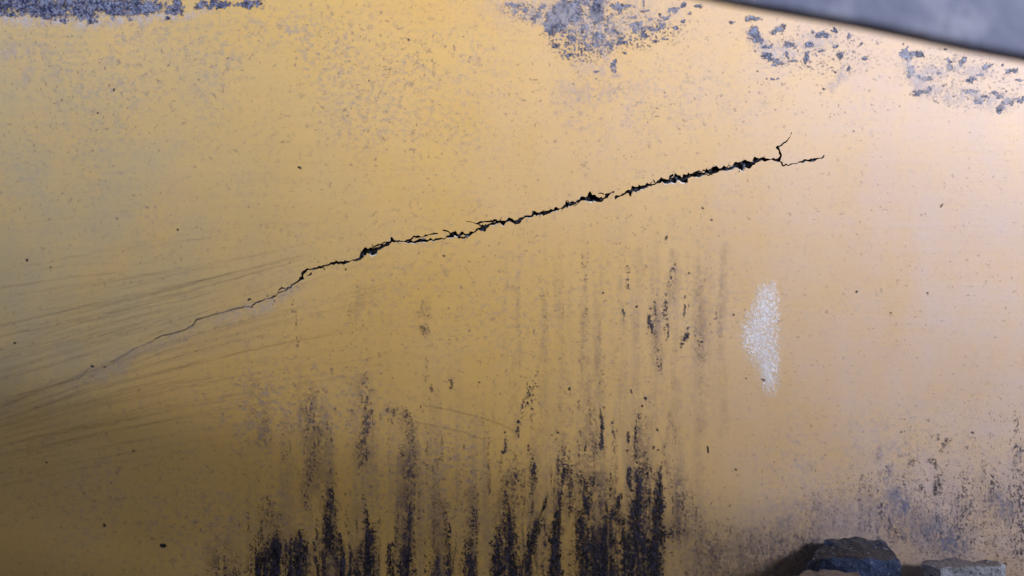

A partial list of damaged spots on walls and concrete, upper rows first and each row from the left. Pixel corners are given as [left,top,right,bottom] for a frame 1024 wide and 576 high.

peeling [0,0,262,26]
peeling [504,0,702,73]
peeling [730,15,868,80]
peeling [899,43,967,103]
peeling [953,62,1024,114]
crack [155,132,825,339]
water stain [648,294,669,367]
water stain [216,375,686,576]